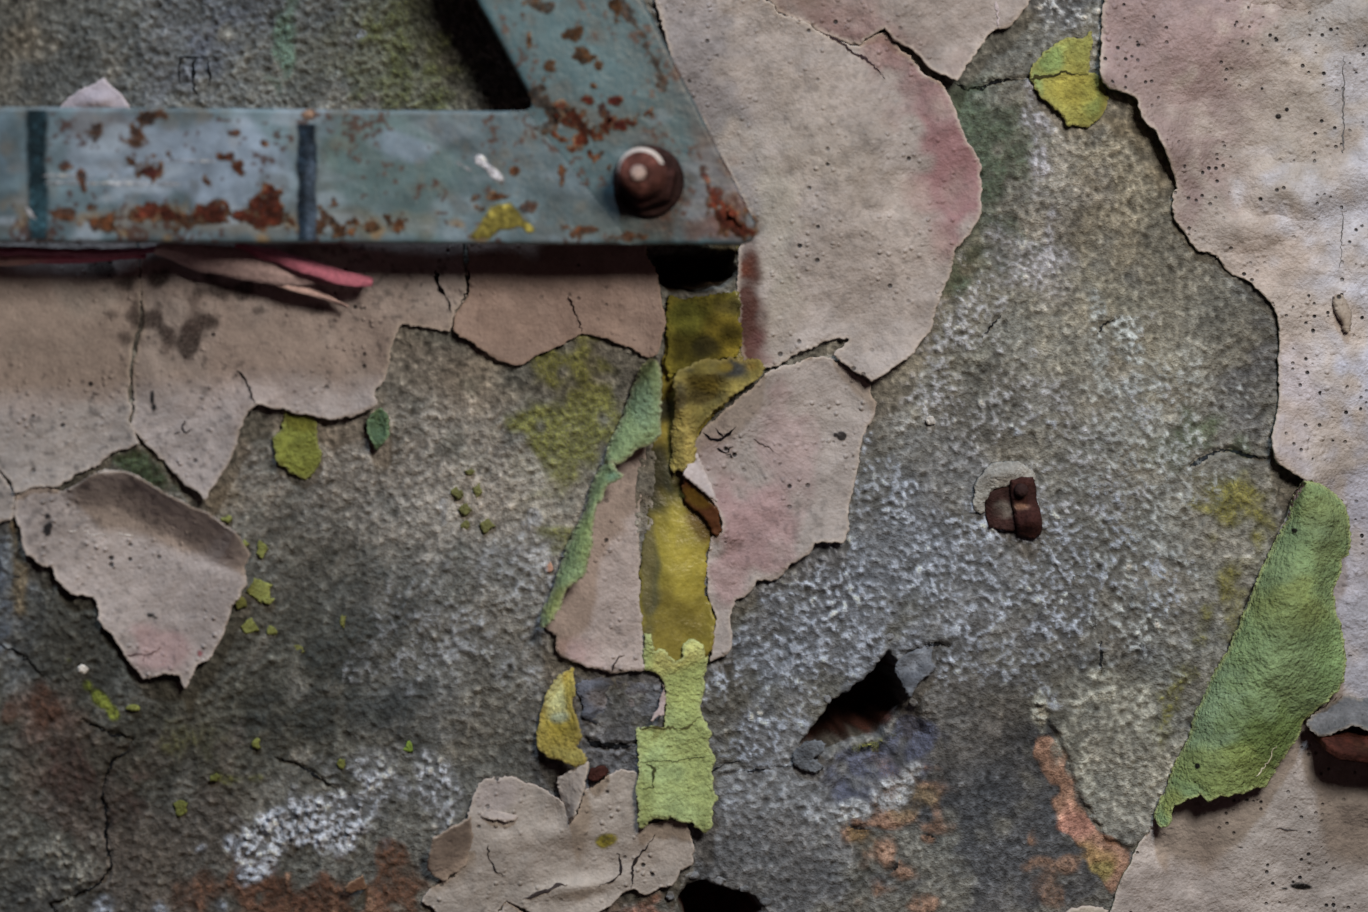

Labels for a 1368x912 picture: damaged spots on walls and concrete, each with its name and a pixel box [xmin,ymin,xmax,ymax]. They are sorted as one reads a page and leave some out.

rust [530,25,654,186]
rust [124,108,172,182]
rust [216,129,245,176]
rust [52,160,296,234]
rust [700,166,759,241]
crack [433,270,470,313]
crack [237,371,255,404]
peeling [0,0,1029,912]
peeling [1025,0,1368,912]
crack [0,644,48,682]
crack [49,718,134,912]
efflorescence [225,752,460,883]